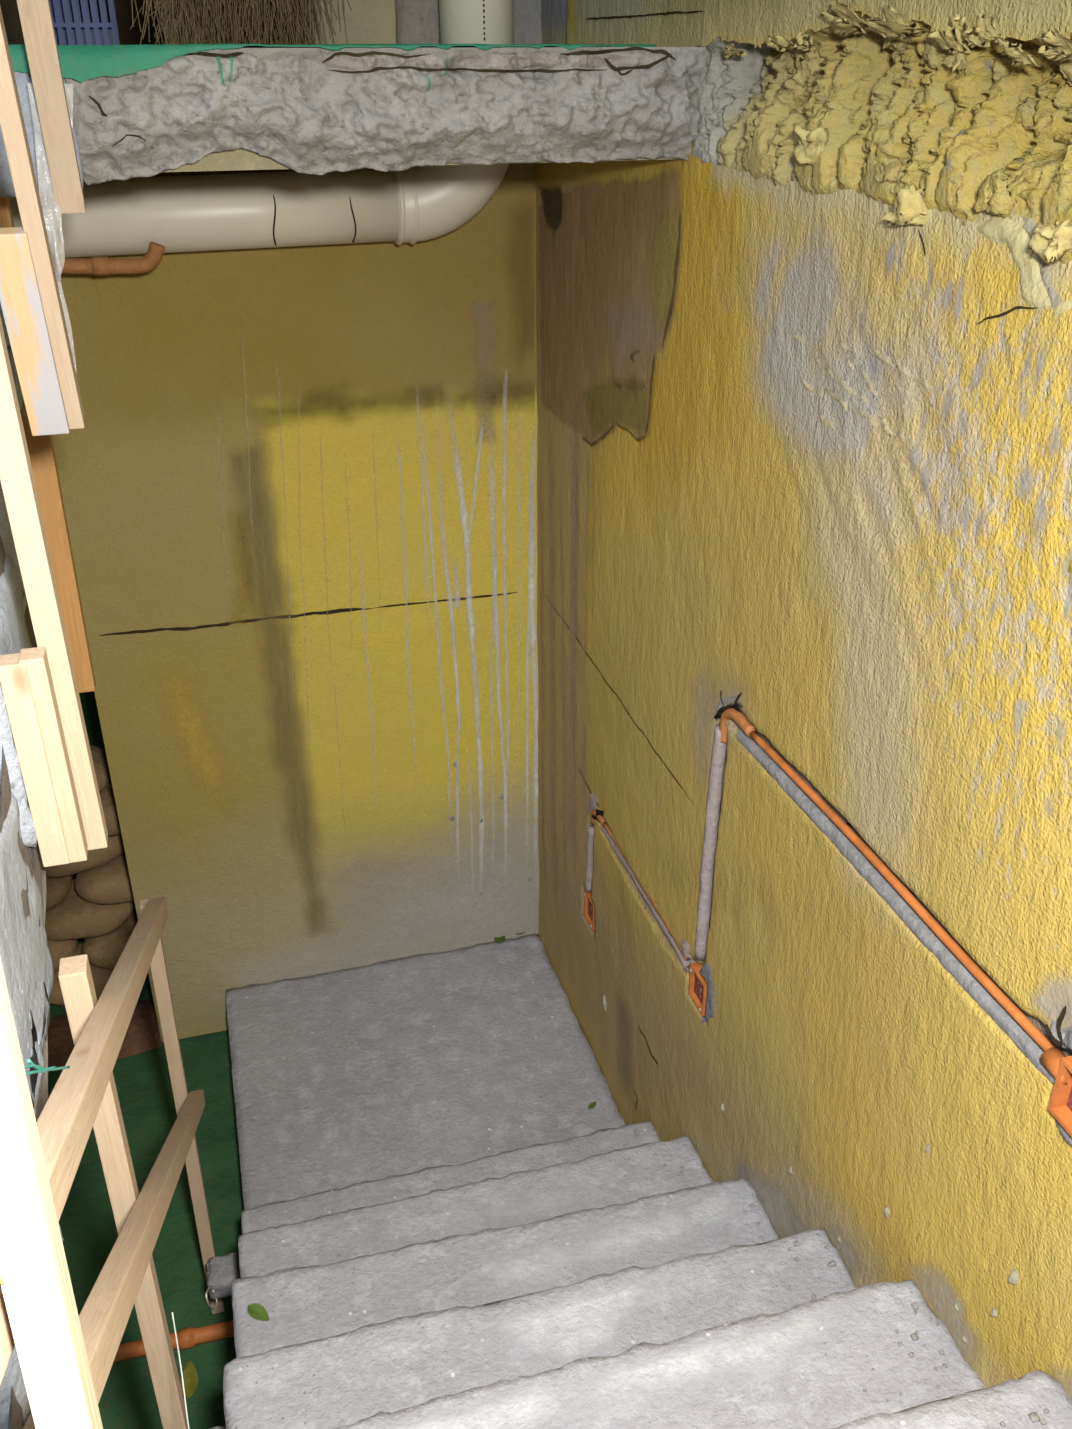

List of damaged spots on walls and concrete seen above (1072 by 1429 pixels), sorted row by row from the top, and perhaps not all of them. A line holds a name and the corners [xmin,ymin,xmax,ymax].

spalling [65,0,1072,325]
peeling [1021,471,1044,528]
crack [98,592,694,804]
damp [404,431,588,919]